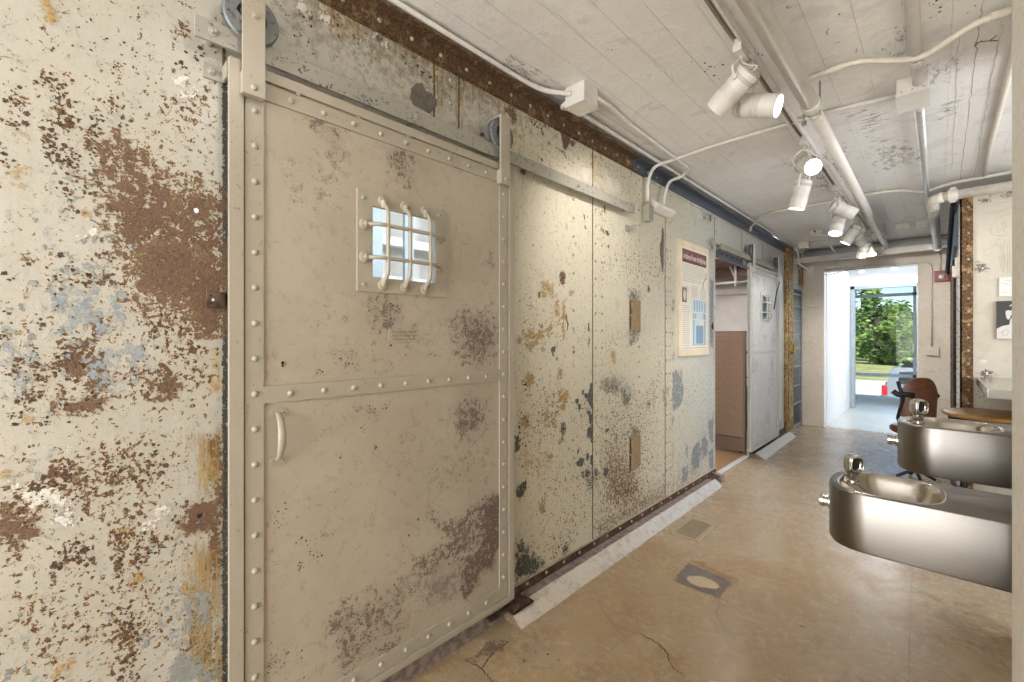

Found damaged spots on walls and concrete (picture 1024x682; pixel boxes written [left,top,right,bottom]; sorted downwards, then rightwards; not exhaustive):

spalling [170,15,206,69]
spalling [0,72,131,214]
rust [560,132,575,151]
peeling [0,234,201,427]
peeling [572,383,616,494]
spalling [0,435,179,549]
rust [592,439,666,536]
spalling [49,540,96,579]
peeling [71,500,226,682]
crack [465,641,508,682]
peeling [514,537,545,582]
crack [587,599,684,675]